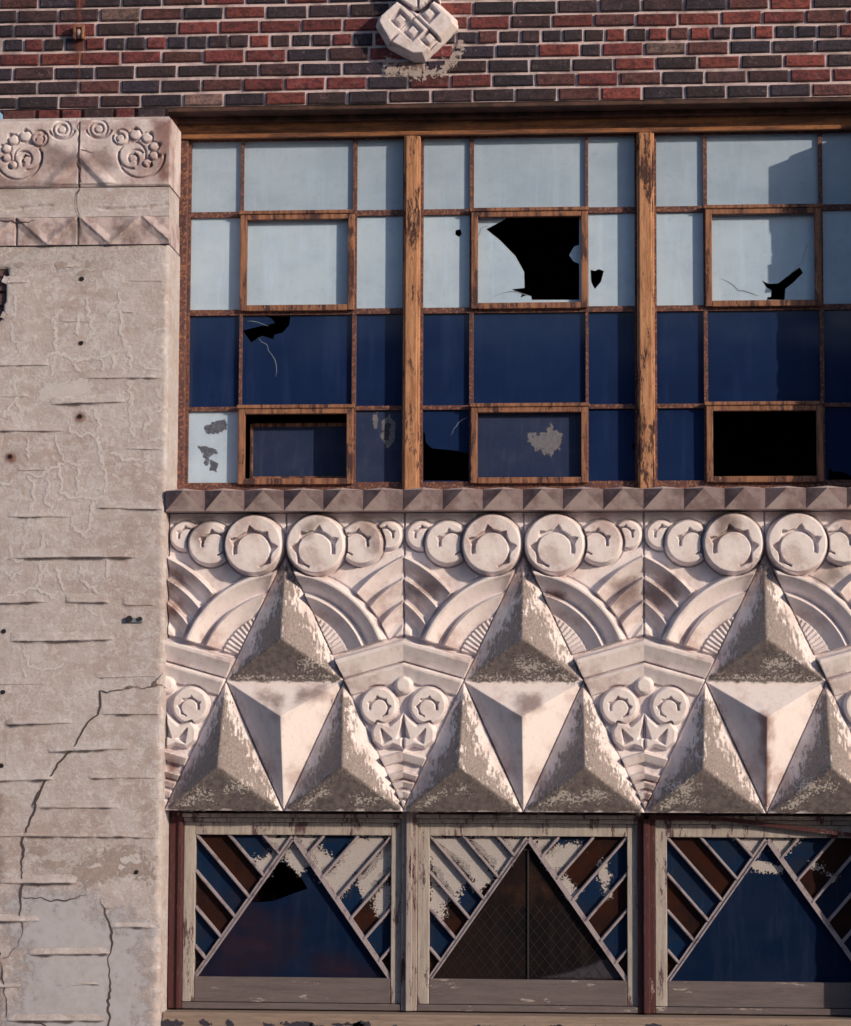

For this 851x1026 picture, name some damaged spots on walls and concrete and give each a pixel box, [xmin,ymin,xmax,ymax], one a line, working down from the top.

spalling [0,262,25,321]
crack [73,123,96,239]
peeling [168,556,851,815]
crack [0,673,166,1026]